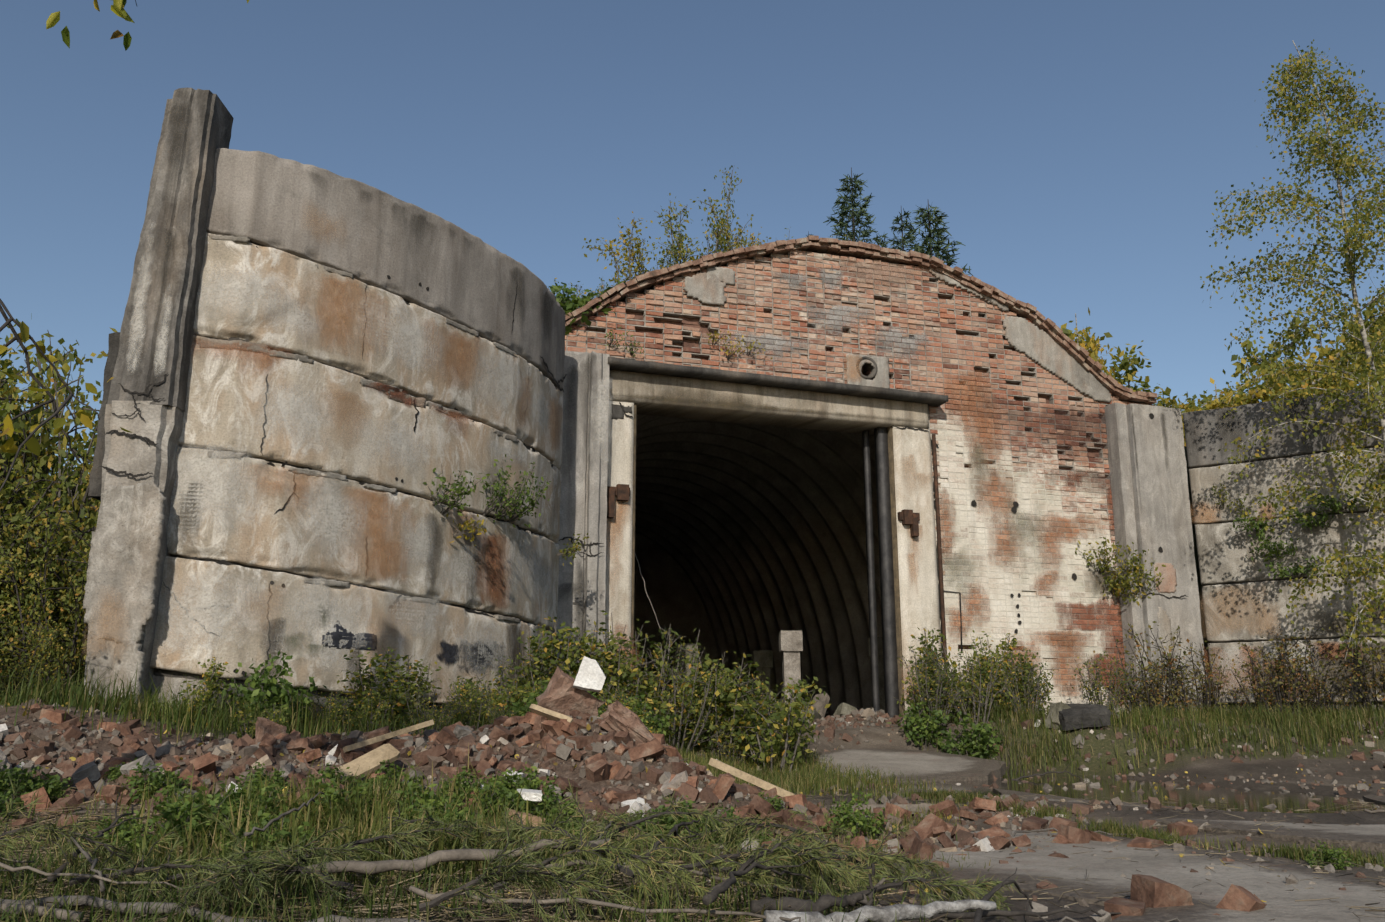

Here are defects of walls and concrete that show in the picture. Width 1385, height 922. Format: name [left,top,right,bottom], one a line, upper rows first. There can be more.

crack [99,373,168,477]
crack [255,347,312,514]
crack [328,286,421,432]
rust [375,382,412,406]
crack [523,356,567,467]
peeling [940,500,954,555]
peeling [949,374,1016,561]
flaking render [928,267,1112,423]
peeling [1036,516,1086,590]
peeling [1057,436,1114,528]
peeling [951,588,984,635]
peeling [1010,599,1127,706]